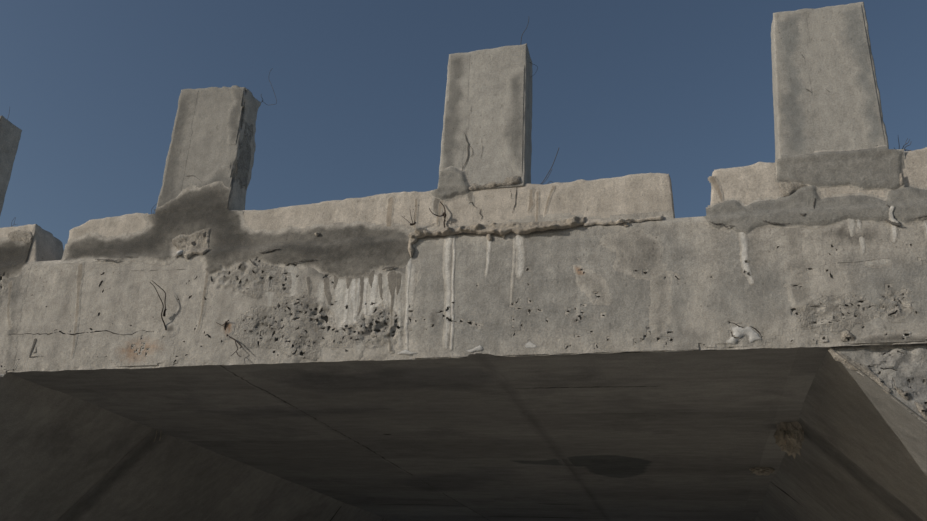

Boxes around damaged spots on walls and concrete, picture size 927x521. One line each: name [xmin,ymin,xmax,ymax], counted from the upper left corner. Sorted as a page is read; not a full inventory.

spalling [172,228,211,259]
damp [185,184,927,424]
crack [0,328,154,371]
peeling [726,326,761,347]
damp [375,453,659,494]